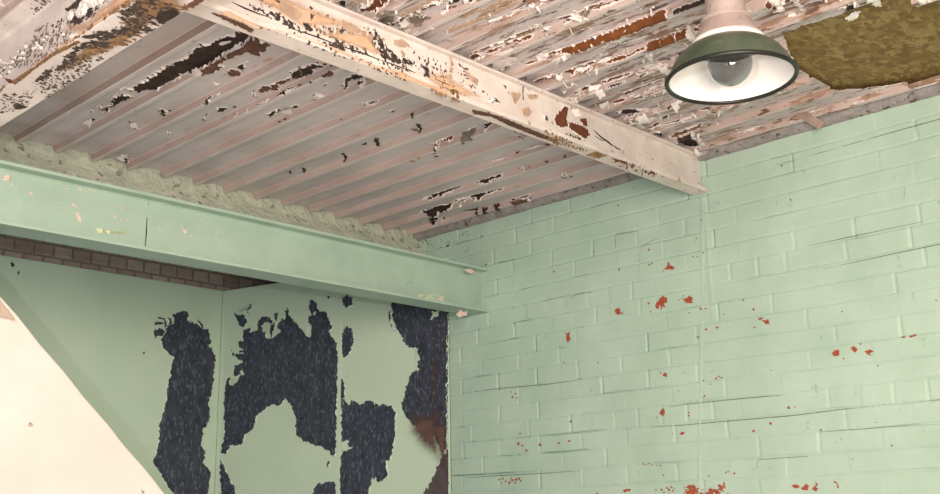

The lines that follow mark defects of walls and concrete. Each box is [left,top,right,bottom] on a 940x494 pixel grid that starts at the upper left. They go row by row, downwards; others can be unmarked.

peeling [0,0,180,113]
peeling [83,12,367,128]
peeling [249,0,721,158]
peeling [420,173,532,226]
peeling [612,158,663,178]
peeling [647,295,707,313]
peeling [151,293,467,494]
rust [414,389,448,494]
peeling [643,463,736,494]